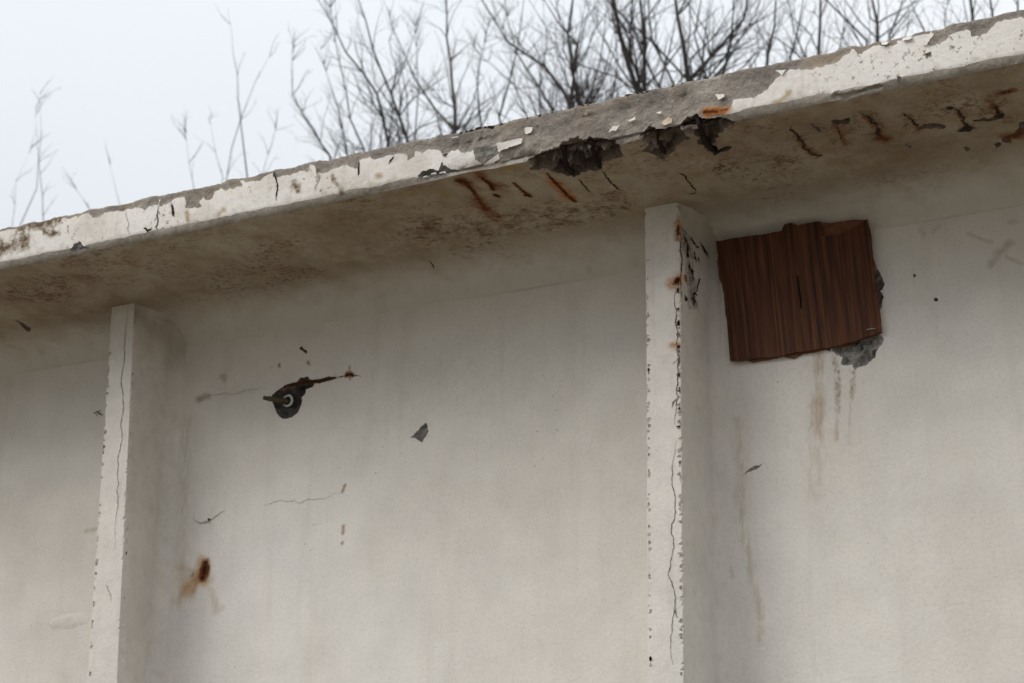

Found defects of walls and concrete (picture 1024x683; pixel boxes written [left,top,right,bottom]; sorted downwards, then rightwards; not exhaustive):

peeling [63,10,1024,219]
rust [455,172,532,229]
spalling [875,264,885,309]
peeling [675,230,709,429]
spalling [818,334,884,370]
spalling [272,376,336,419]
spalling [410,423,428,442]
crack [668,287,679,662]
rust [194,559,210,582]